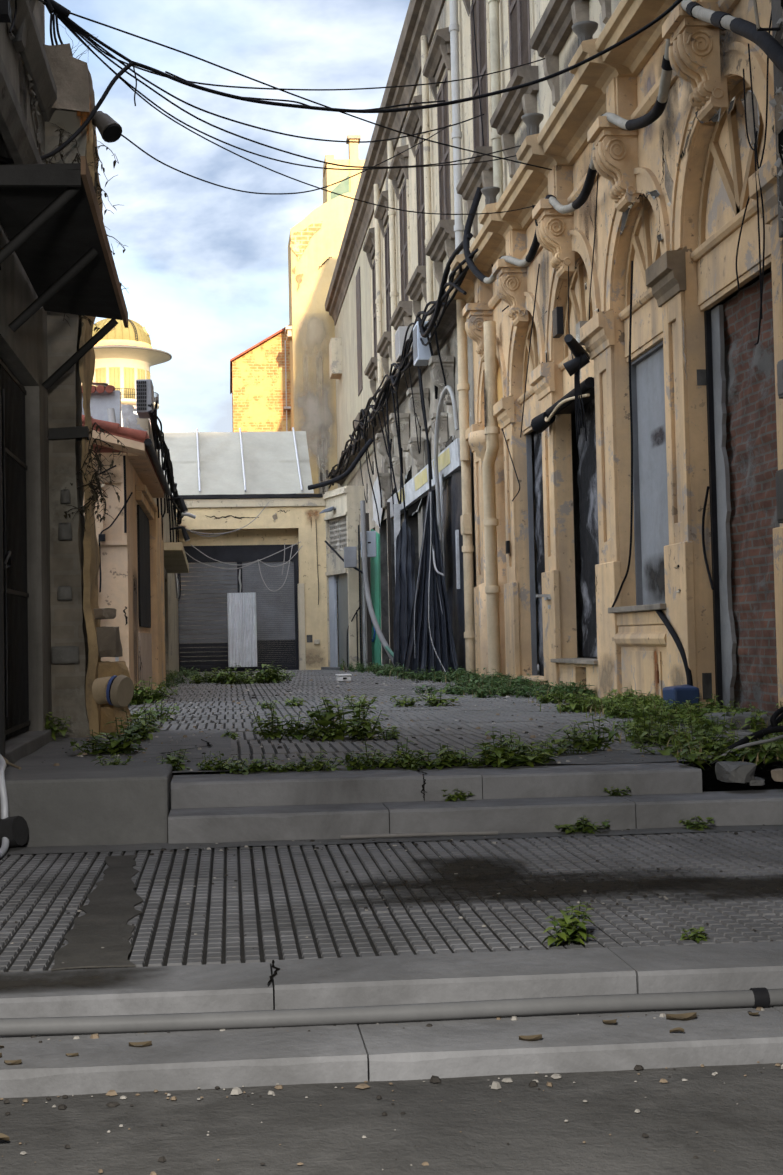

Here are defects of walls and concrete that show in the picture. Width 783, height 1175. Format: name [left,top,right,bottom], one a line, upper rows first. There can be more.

crack [267,960,280,985]